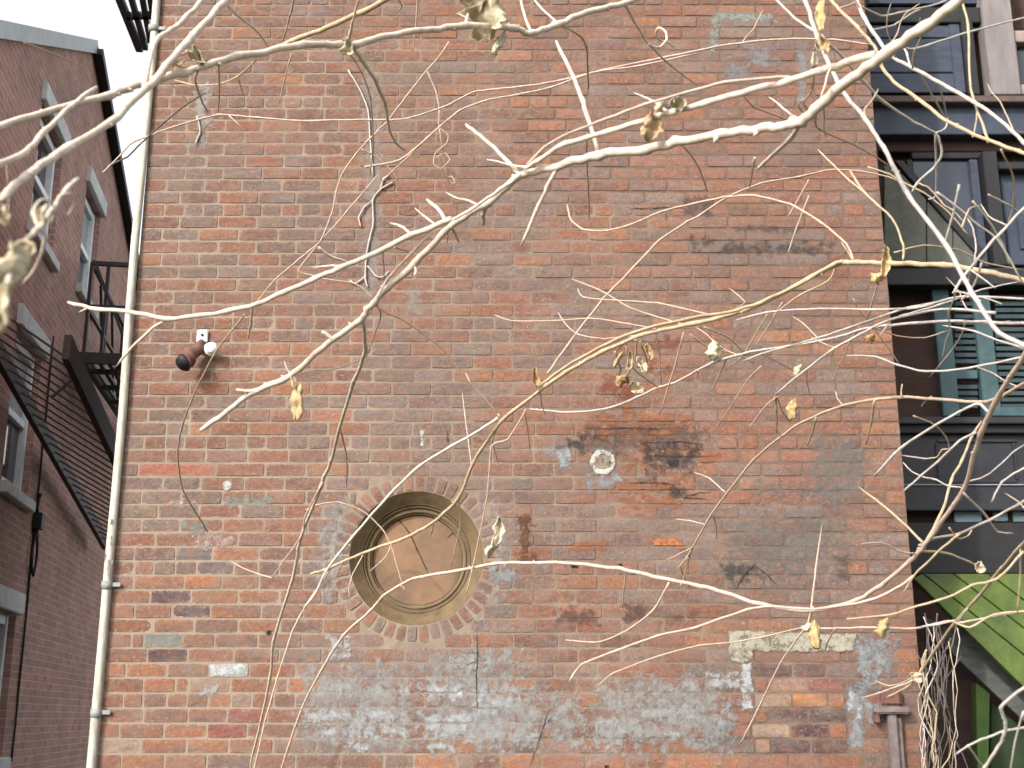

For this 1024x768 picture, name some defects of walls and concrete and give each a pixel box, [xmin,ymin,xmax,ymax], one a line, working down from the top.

damp [722,241,833,253]
rust [518,514,534,554]
spalling [653,537,684,549]
crack [466,628,478,720]
damp [303,649,754,755]
damp [844,629,900,749]